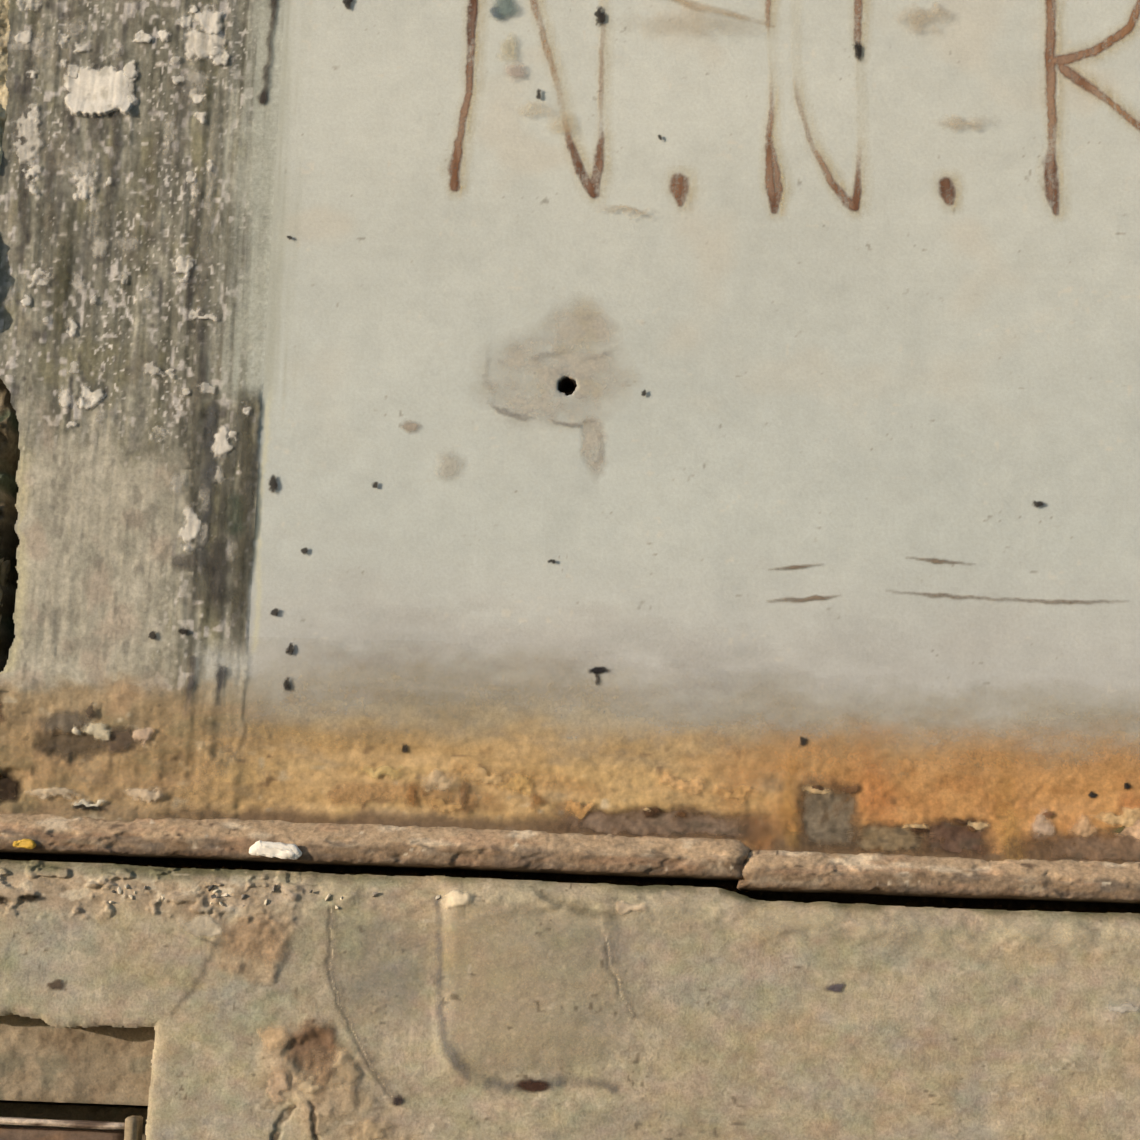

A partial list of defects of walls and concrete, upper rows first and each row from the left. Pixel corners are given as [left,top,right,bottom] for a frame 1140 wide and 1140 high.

peeling [59,34,137,116]
peeling [133,30,168,43]
peeling [170,4,229,123]
peeling [13,103,43,194]
peeling [59,386,103,421]
peeling [212,426,236,481]
peeling [179,507,206,551]
leakage [172,399,255,621]
leakage [186,657,195,701]
leakage [216,666,226,691]
spalling [260,1024,360,1102]
crack [272,1103,318,1140]